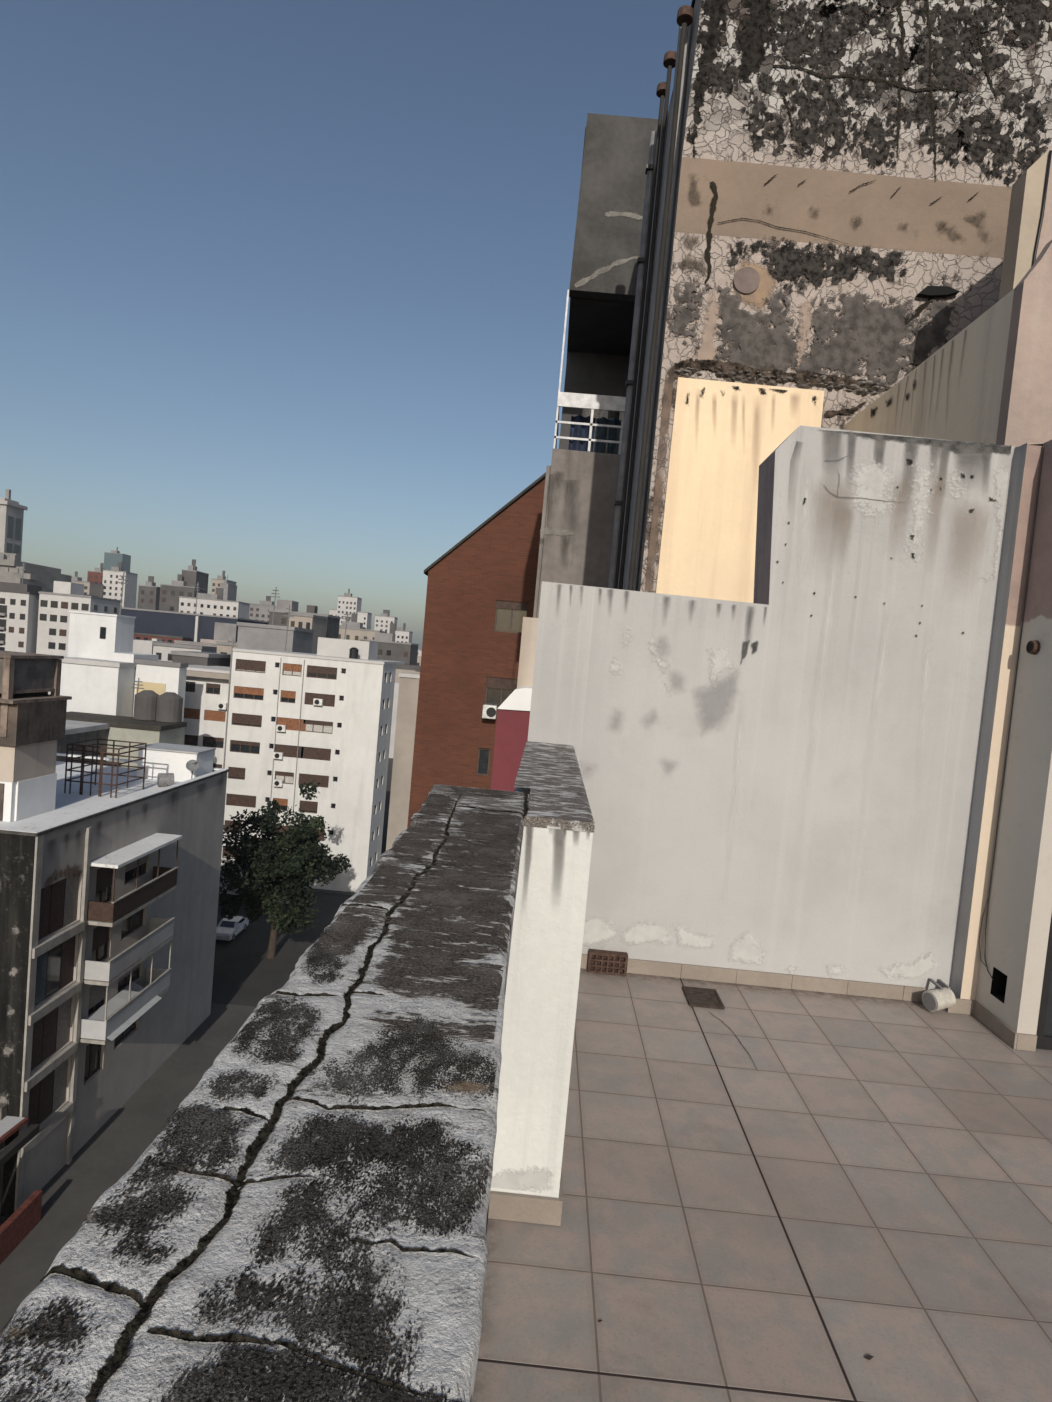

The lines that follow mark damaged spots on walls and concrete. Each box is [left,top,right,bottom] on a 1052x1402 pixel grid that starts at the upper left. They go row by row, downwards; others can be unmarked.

spalling [757,72,775,94]
crack [704,182,848,284]
peeling [670,273,961,417]
damp [645,373,680,590]
damp [825,430,1012,471]
damp [741,640,758,663]
crack [40,788,529,1402]